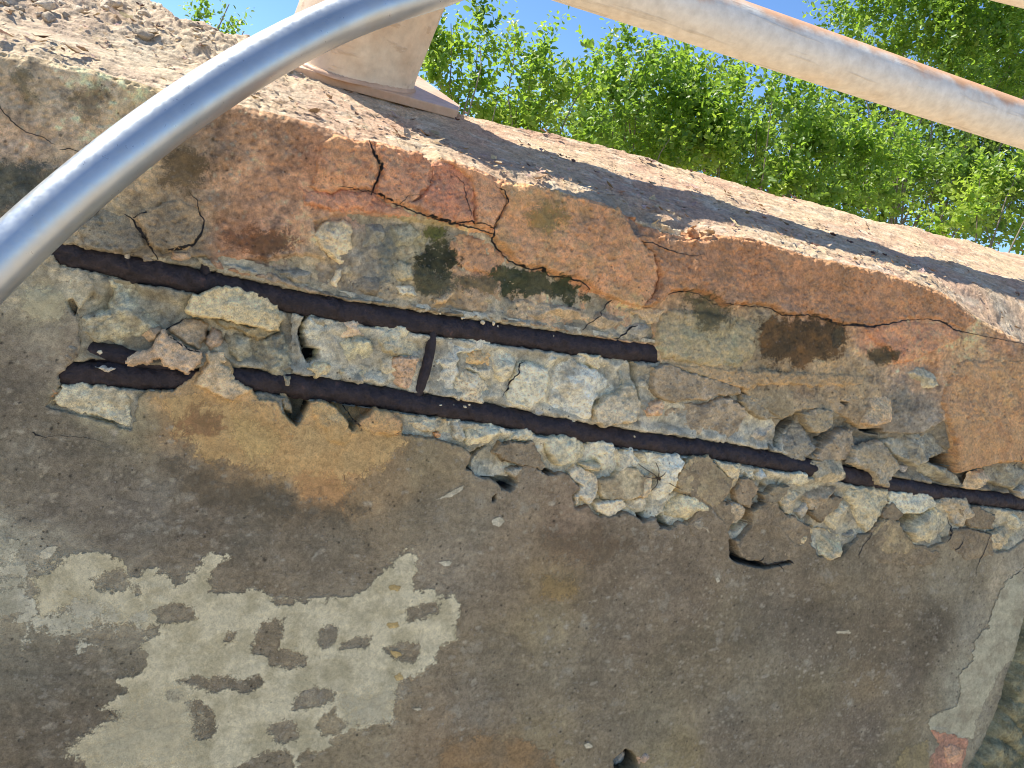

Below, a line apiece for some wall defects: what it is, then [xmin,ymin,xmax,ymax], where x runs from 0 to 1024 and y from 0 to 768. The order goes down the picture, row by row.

peeling [0,7,222,81]
crack [124,191,205,260]
rust [51,244,658,363]
rust [59,342,818,511]
crack [341,140,612,330]
water stain [412,225,595,307]
spalling [47,214,1024,567]
peeling [251,71,1007,309]
water stain [754,309,850,374]
crack [668,290,1024,344]
rust [841,465,1024,511]
peeling [30,546,461,768]